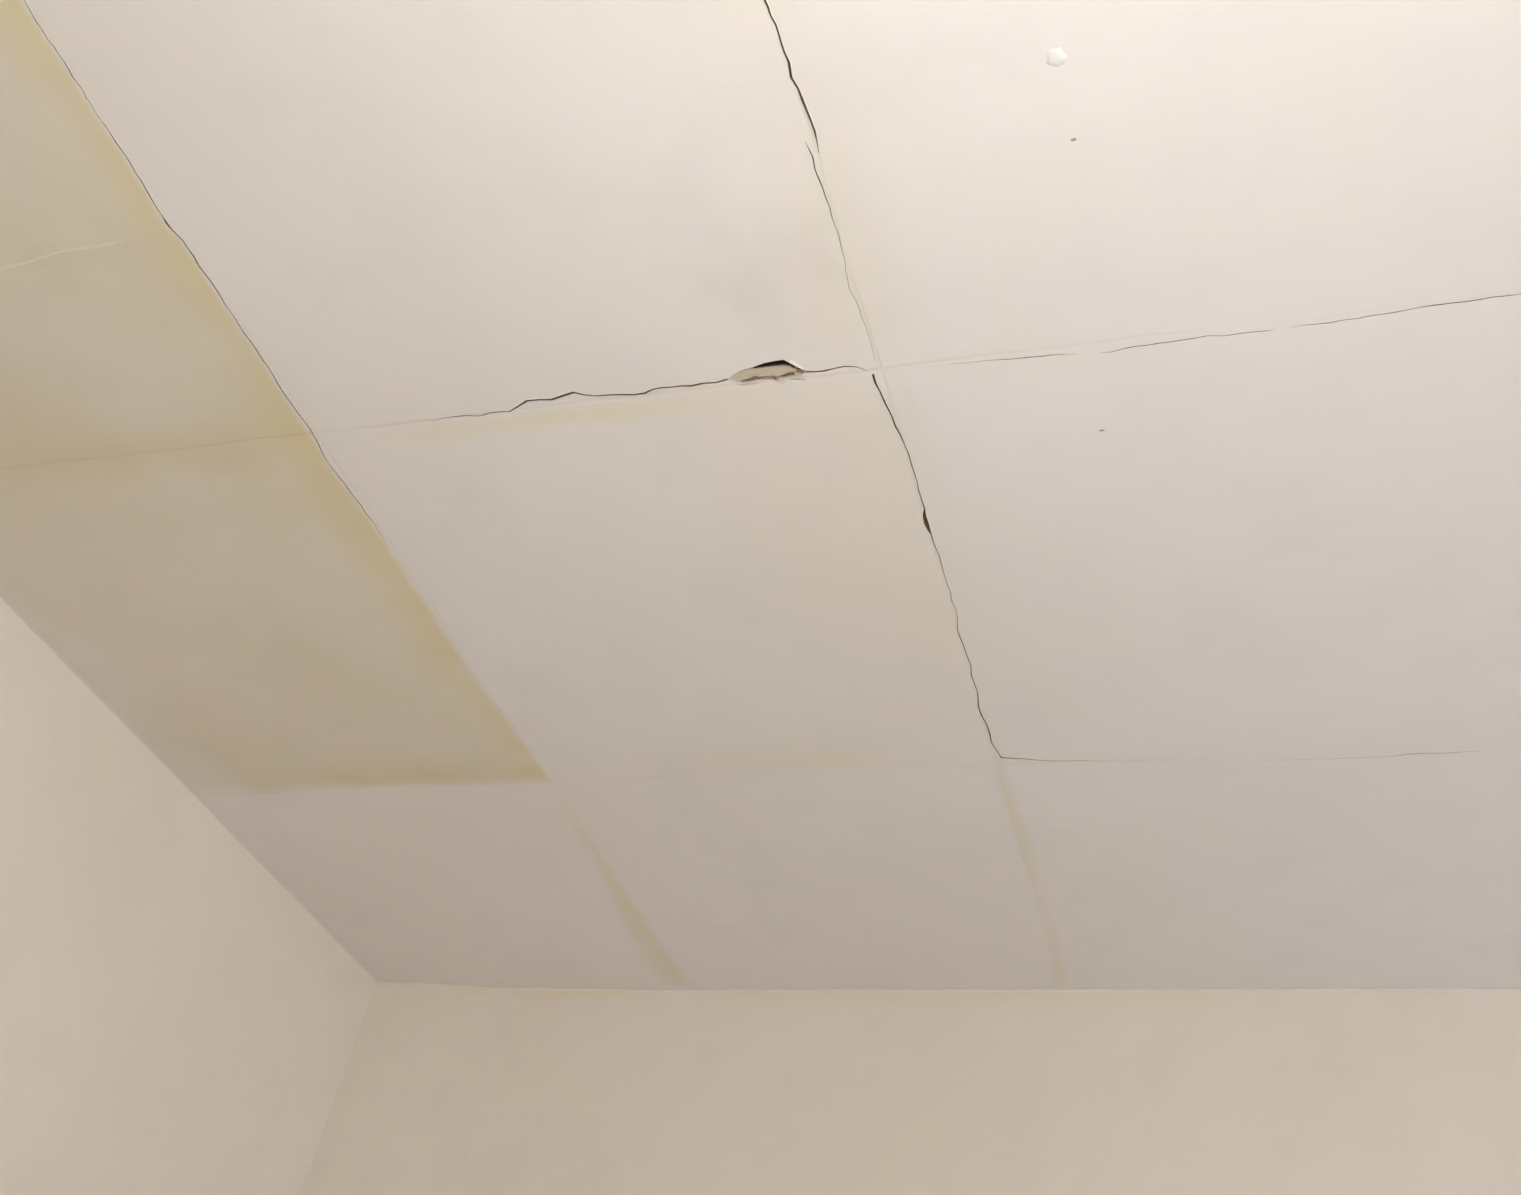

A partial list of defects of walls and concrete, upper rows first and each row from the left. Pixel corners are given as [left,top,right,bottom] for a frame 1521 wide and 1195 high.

crack [23,0,543,765]
crack [433,379,727,422]
damp [0,0,1315,1020]
flaking render [727,360,807,386]
crack [761,0,1183,762]
crack [1112,293,1521,352]